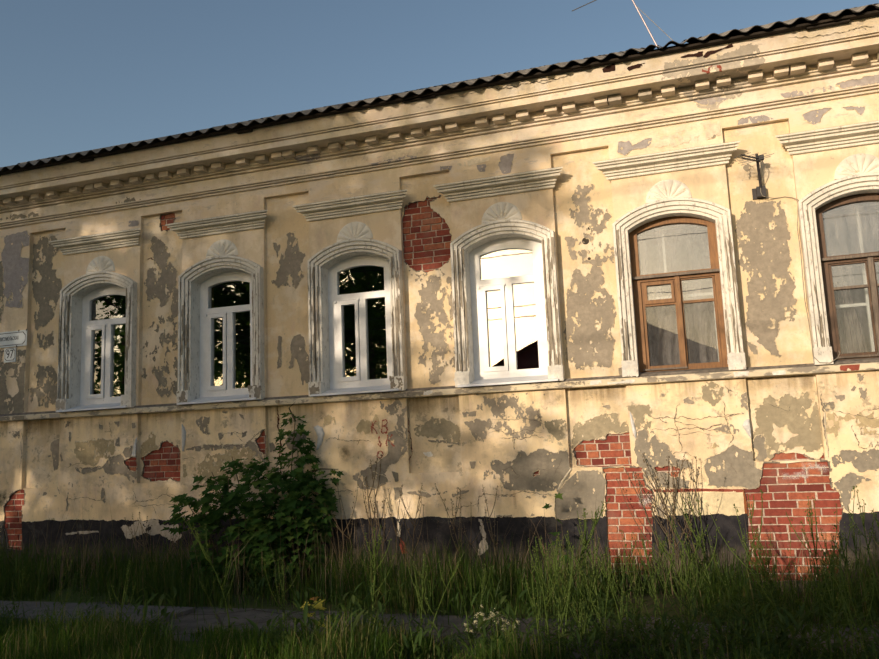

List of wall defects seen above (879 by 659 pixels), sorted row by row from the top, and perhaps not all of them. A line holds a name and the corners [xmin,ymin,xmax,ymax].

peeling [0,212,277,503]
peeling [271,232,321,395]
peeling [353,183,879,582]
crack [651,388,751,472]
crack [820,394,879,449]
flaking render [3,488,26,550]